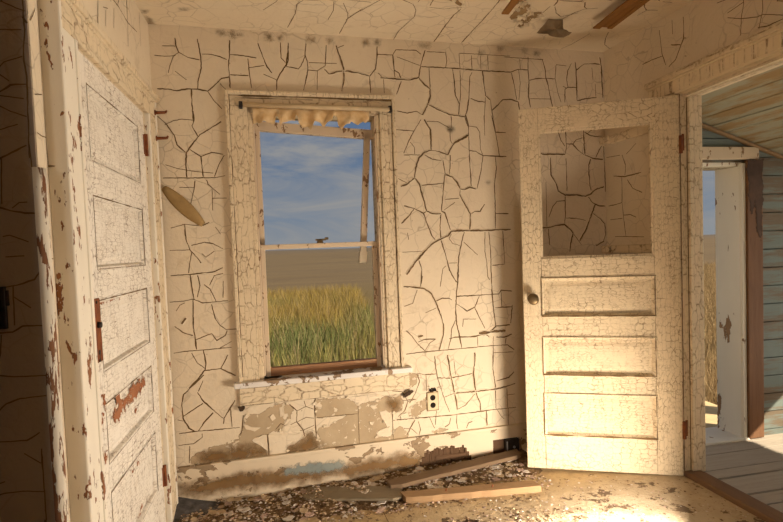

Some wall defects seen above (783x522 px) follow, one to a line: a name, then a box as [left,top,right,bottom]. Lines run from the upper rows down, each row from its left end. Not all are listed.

peeling [510,0,544,30]
crack [637,0,684,67]
crack [0,0,54,259]
crack [155,0,612,463]
crack [541,130,642,252]
crack [0,272,71,522]
peeling [101,377,146,432]
peeling [190,372,441,464]